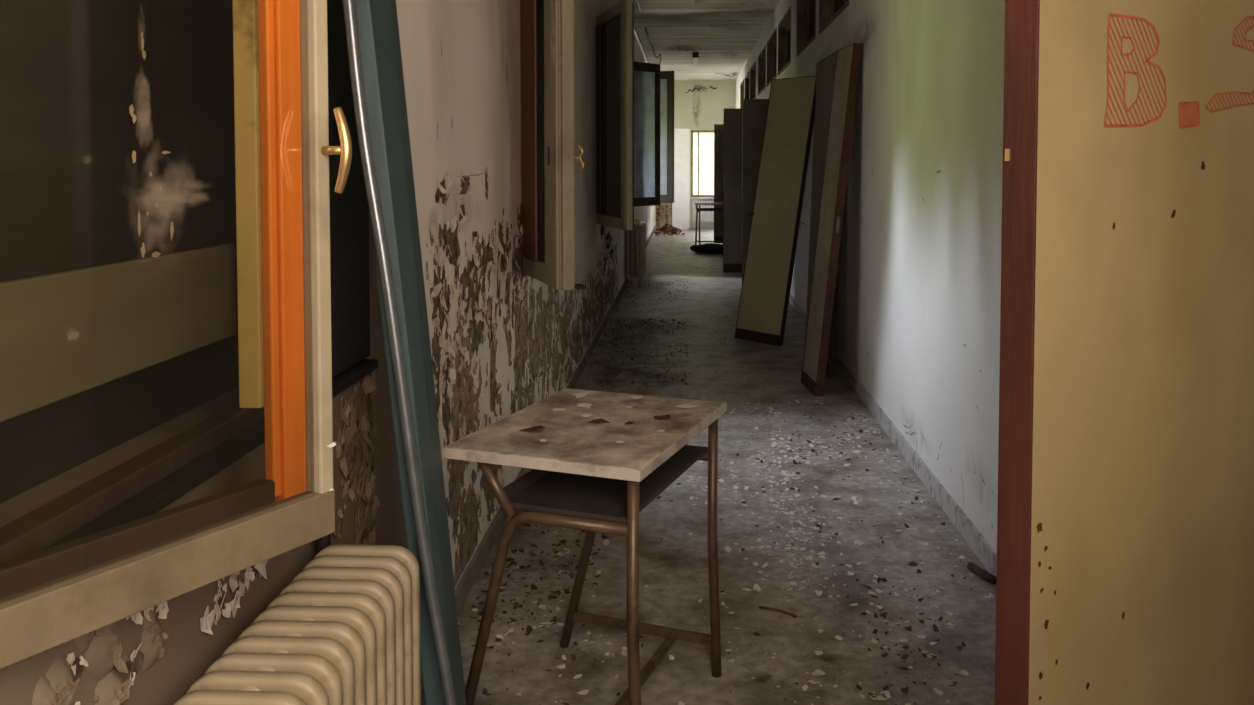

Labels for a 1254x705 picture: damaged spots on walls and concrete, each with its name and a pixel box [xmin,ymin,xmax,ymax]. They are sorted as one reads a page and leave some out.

peeling [426,164,619,586]
peeling [126,601,169,625]
peeling [200,560,268,635]
peeling [66,652,88,681]
peeling [121,644,145,688]